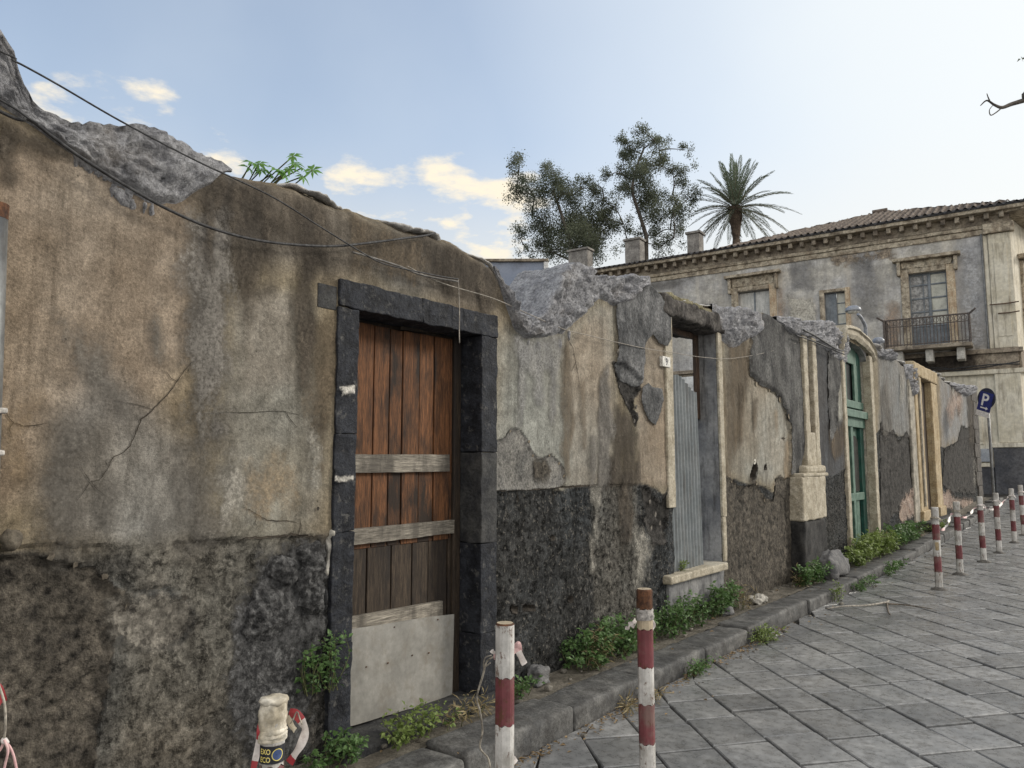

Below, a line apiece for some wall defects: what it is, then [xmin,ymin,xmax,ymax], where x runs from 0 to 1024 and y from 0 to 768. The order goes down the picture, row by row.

crack [77,362,192,500]
leakage [174,175,336,550]
peeling [495,429,566,491]
spalling [613,349,642,426]
peeling [724,298,816,602]